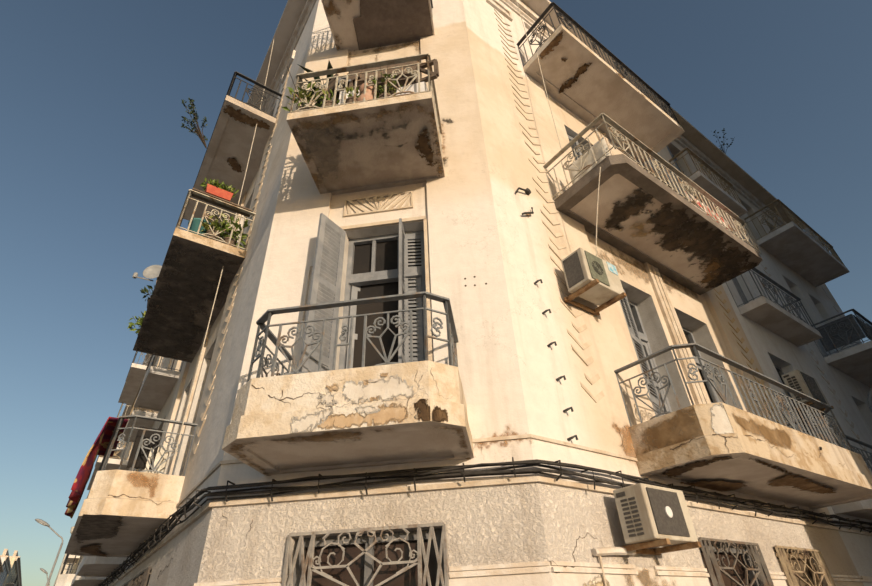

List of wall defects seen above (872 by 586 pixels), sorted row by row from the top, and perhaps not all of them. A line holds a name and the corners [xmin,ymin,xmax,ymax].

leakage [324,0,340,16]
spalling [223,105,270,130]
leakage [292,103,453,188]
peeling [227,158,244,173]
leakage [601,188,758,296]
leakage [137,239,238,360]
peeling [290,373,448,433]
peeling [710,403,734,434]
spalling [661,457,746,492]
spalling [749,458,836,494]
peeling [583,575,610,586]